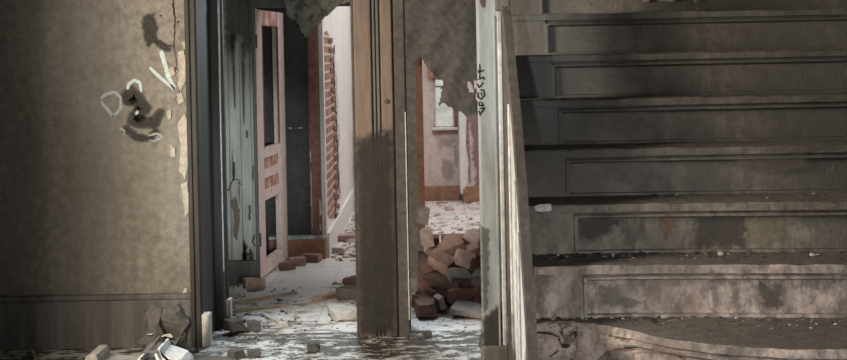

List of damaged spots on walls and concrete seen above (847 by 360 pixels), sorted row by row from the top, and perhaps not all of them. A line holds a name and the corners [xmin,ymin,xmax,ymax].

flaking render [167,41,189,217]
leakage [466,102,479,186]
leakage [601,287,639,307]